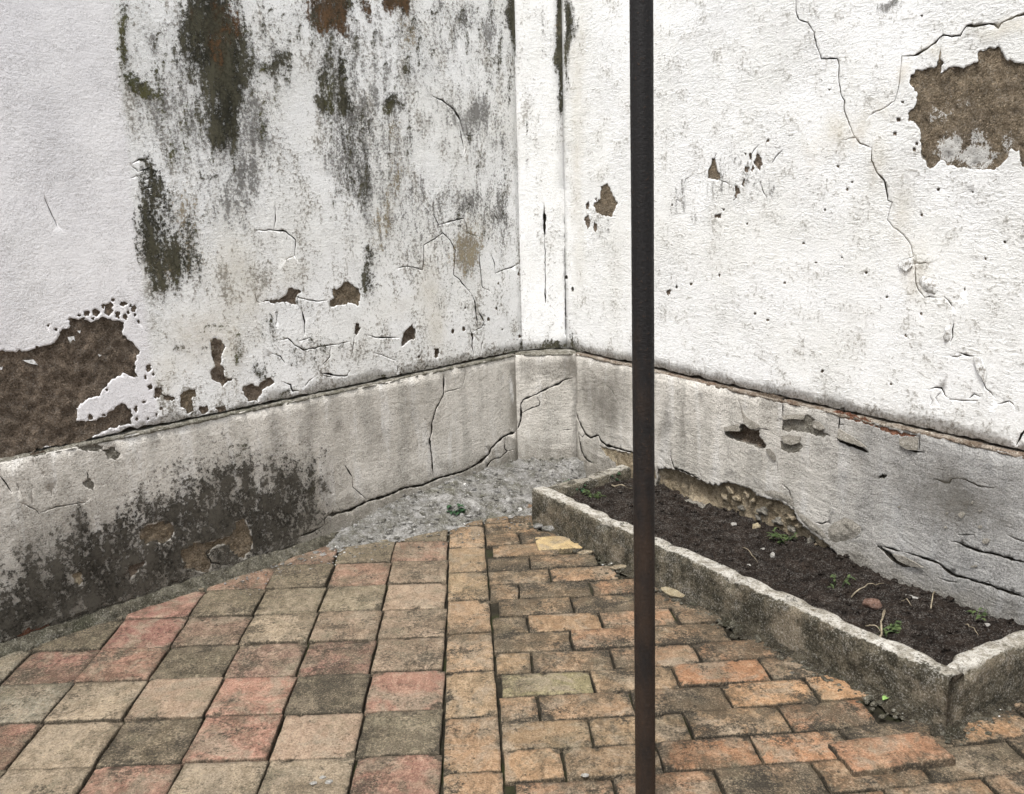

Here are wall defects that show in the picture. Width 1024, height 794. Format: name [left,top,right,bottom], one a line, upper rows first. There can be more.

leakage [119,0,528,317]
leakage [541,0,579,95]
flaking render [584,183,618,231]
crack [796,11,993,395]
crack [873,13,1024,114]
flaking render [893,47,1024,170]
flaking render [0,299,236,460]
leakage [251,296,345,384]
flaking render [263,282,360,307]
crack [287,377,571,547]
spalling [655,468,830,548]
crack [878,546,1023,597]